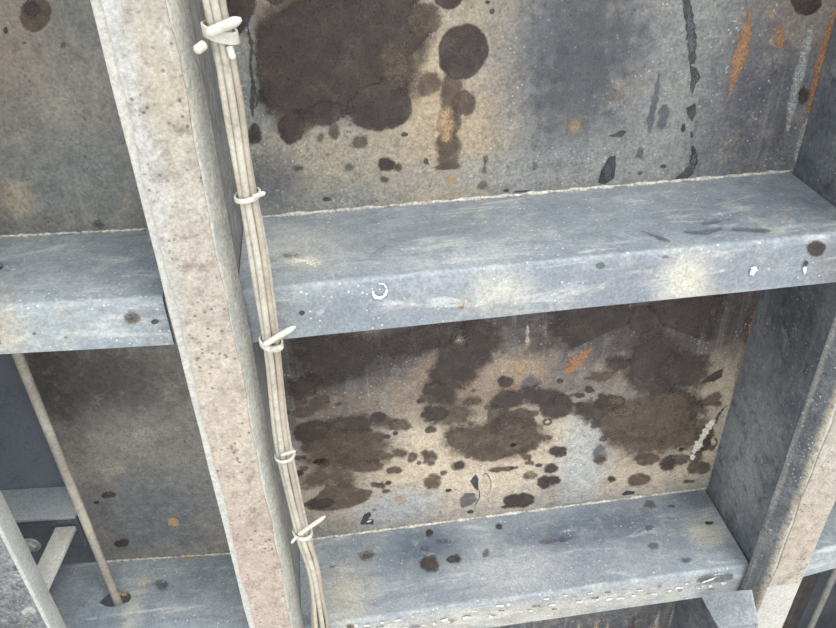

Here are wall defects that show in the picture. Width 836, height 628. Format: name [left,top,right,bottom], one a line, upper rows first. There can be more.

damp [227,0,489,148]
rust [729,12,752,96]
rust [807,12,835,115]
damp [378,157,402,182]
damp [287,293,731,511]
rust [564,349,590,373]